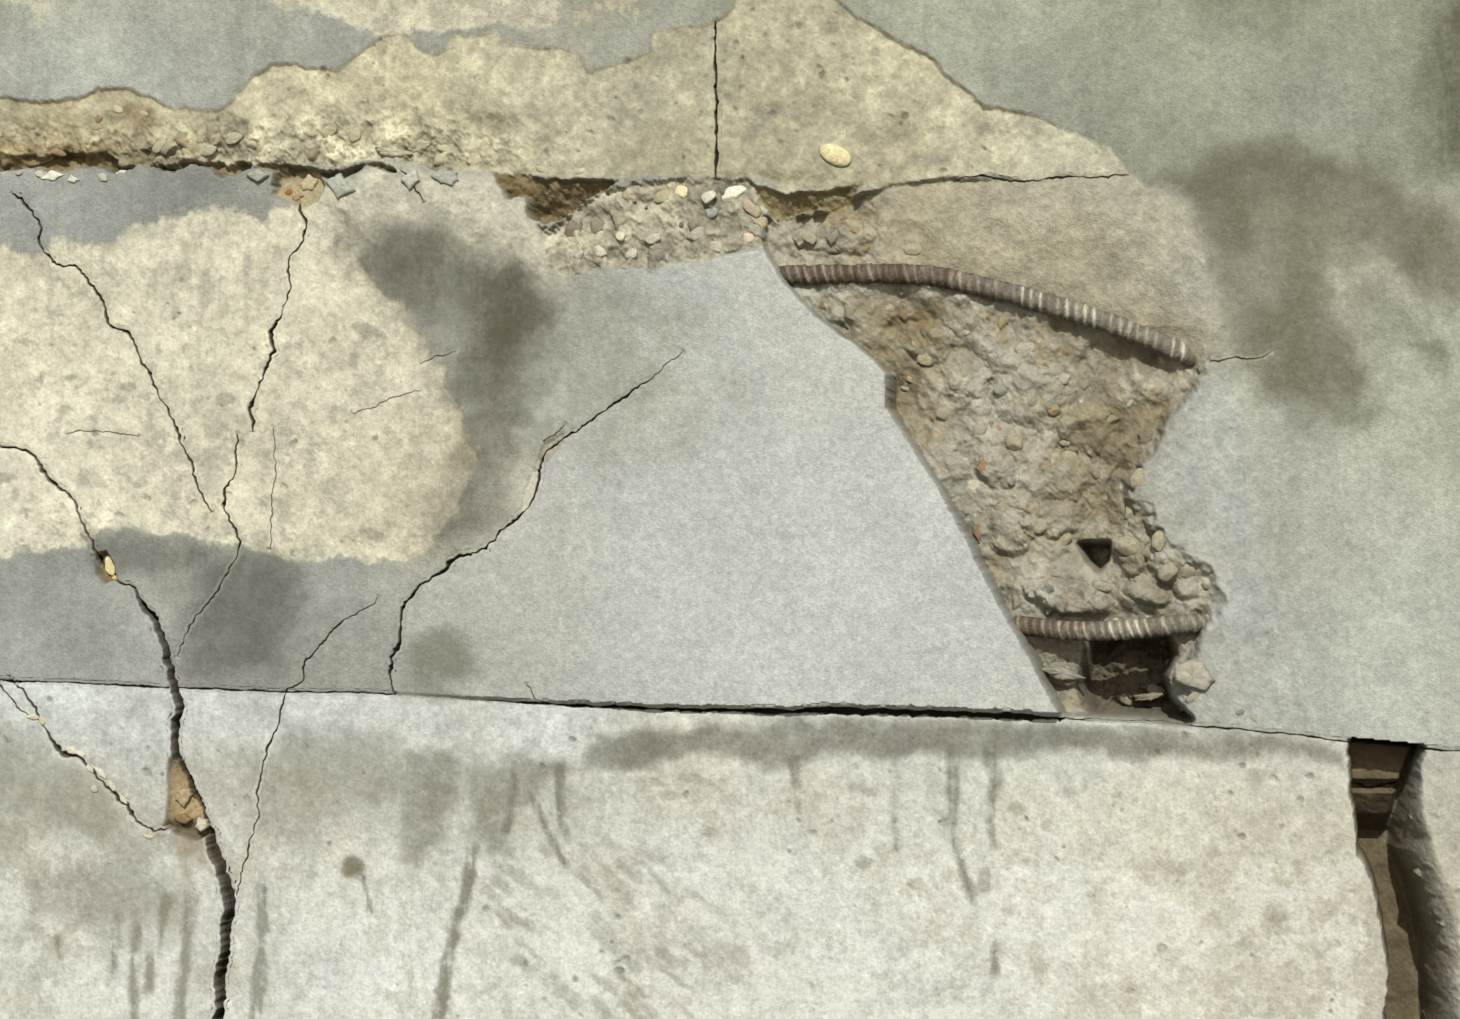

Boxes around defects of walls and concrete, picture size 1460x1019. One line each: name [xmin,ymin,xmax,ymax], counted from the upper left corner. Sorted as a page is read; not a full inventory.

spalling [0,0,1313,733]
damp [1244,265,1358,403]
crack [0,190,684,1019]
damp [344,858,363,875]
damp [433,848,475,1019]
damp [538,765,565,862]
damp [594,727,781,765]
damp [789,721,972,793]
crack [488,682,1460,1019]
damp [984,727,1206,803]